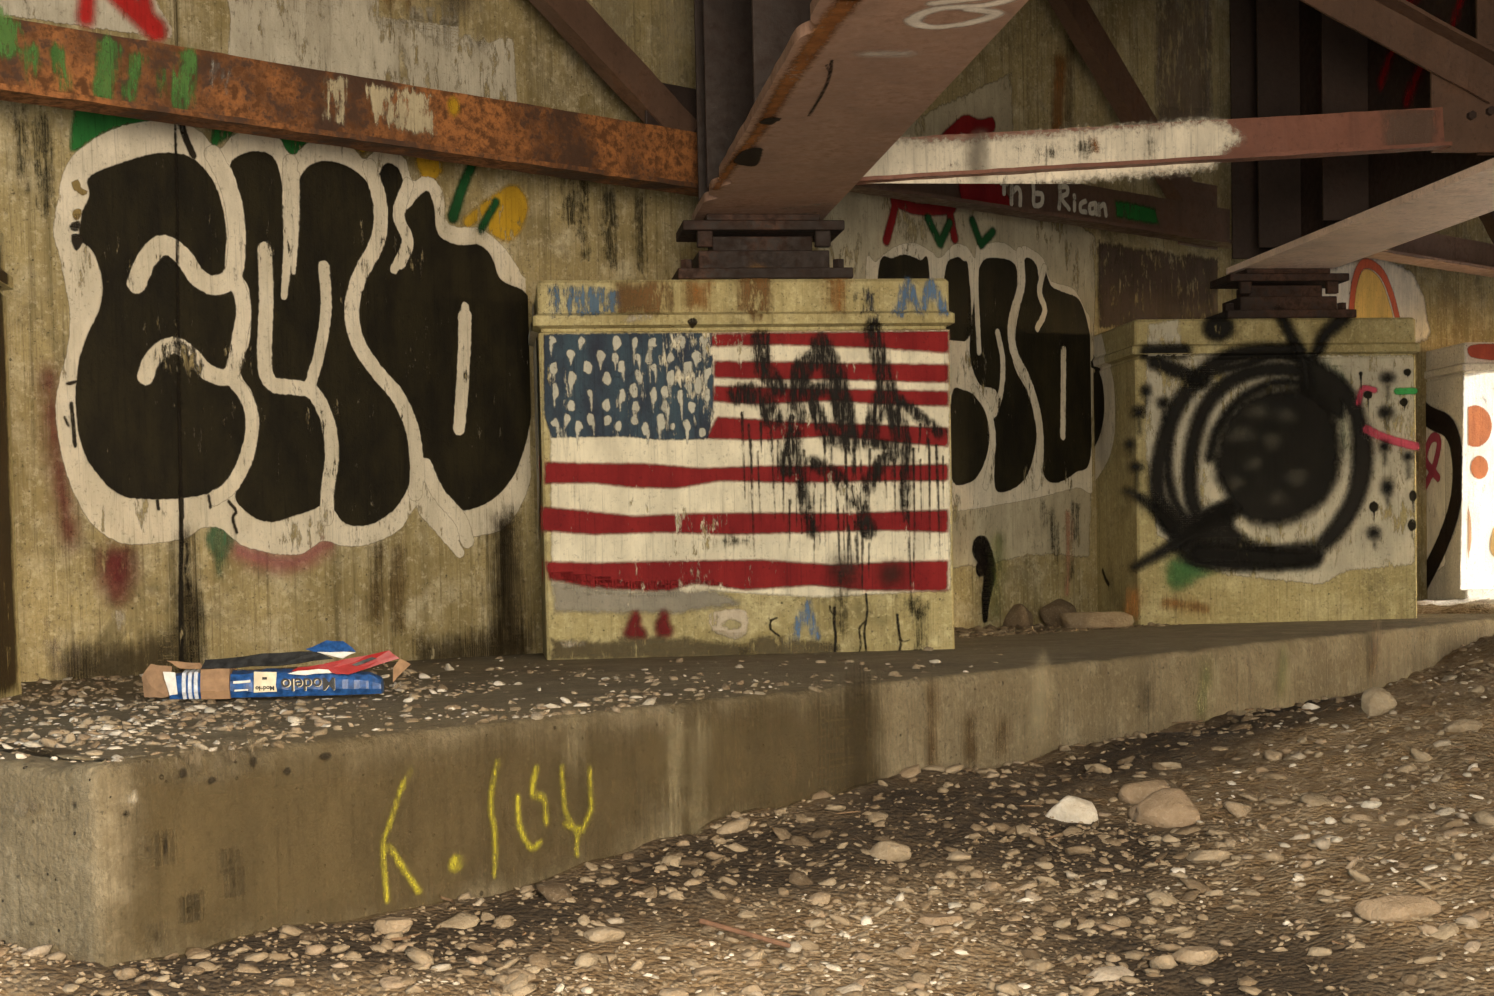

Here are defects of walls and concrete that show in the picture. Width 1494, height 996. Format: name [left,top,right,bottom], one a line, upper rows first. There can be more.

rust [711,0,861,190]
rust [1052,48,1074,129]
water stain [64,534,204,680]
water stain [418,510,526,660]